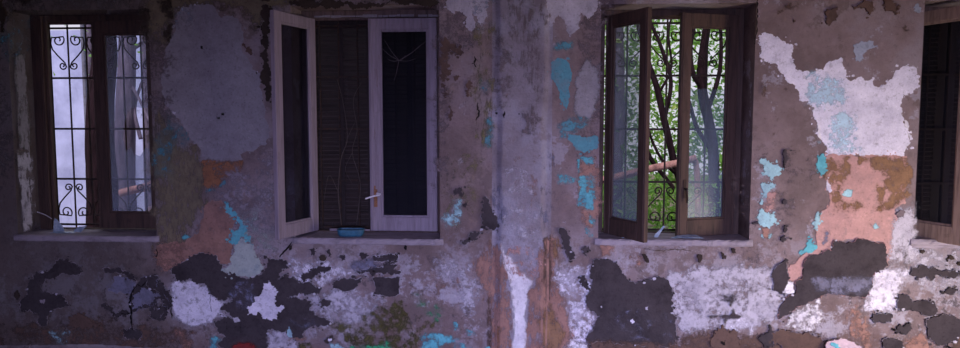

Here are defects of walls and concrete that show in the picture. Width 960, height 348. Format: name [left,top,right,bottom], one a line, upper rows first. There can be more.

flaking render [14,256,83,327]
leakage [0,0,298,249]
peeling [157,0,273,164]
flaking render [101,201,407,348]
flaking render [289,0,490,31]
leakage [433,0,551,213]
leakage [492,166,548,348]
peeling [546,0,601,37]
flaking render [558,227,681,348]
flaking render [707,324,743,348]
peeling [756,32,920,348]
flaking render [870,250,960,348]